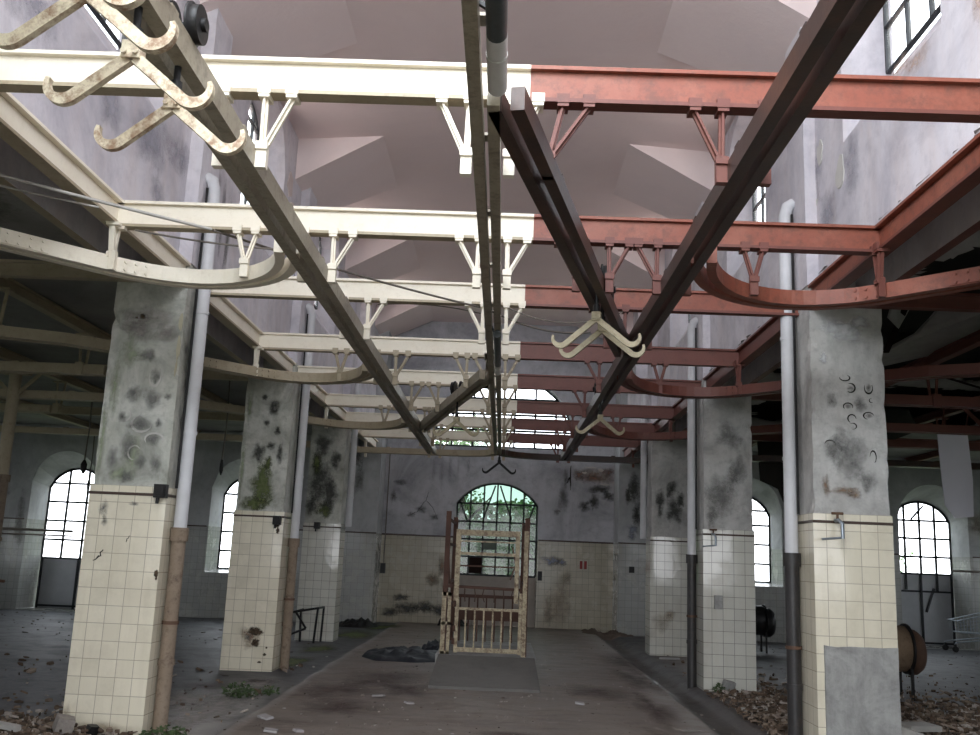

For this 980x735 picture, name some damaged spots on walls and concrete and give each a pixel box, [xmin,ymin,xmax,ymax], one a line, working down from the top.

leakage [129,389,170,404]
leakage [120,414,160,442]
leakage [253,395,282,461]
leakage [828,439,860,468]
leakage [307,437,341,512]
leakage [580,486,614,510]
leakage [626,475,640,539]
leakage [656,483,683,523]
corrosion [824,480,858,497]
spalling [243,627,267,663]